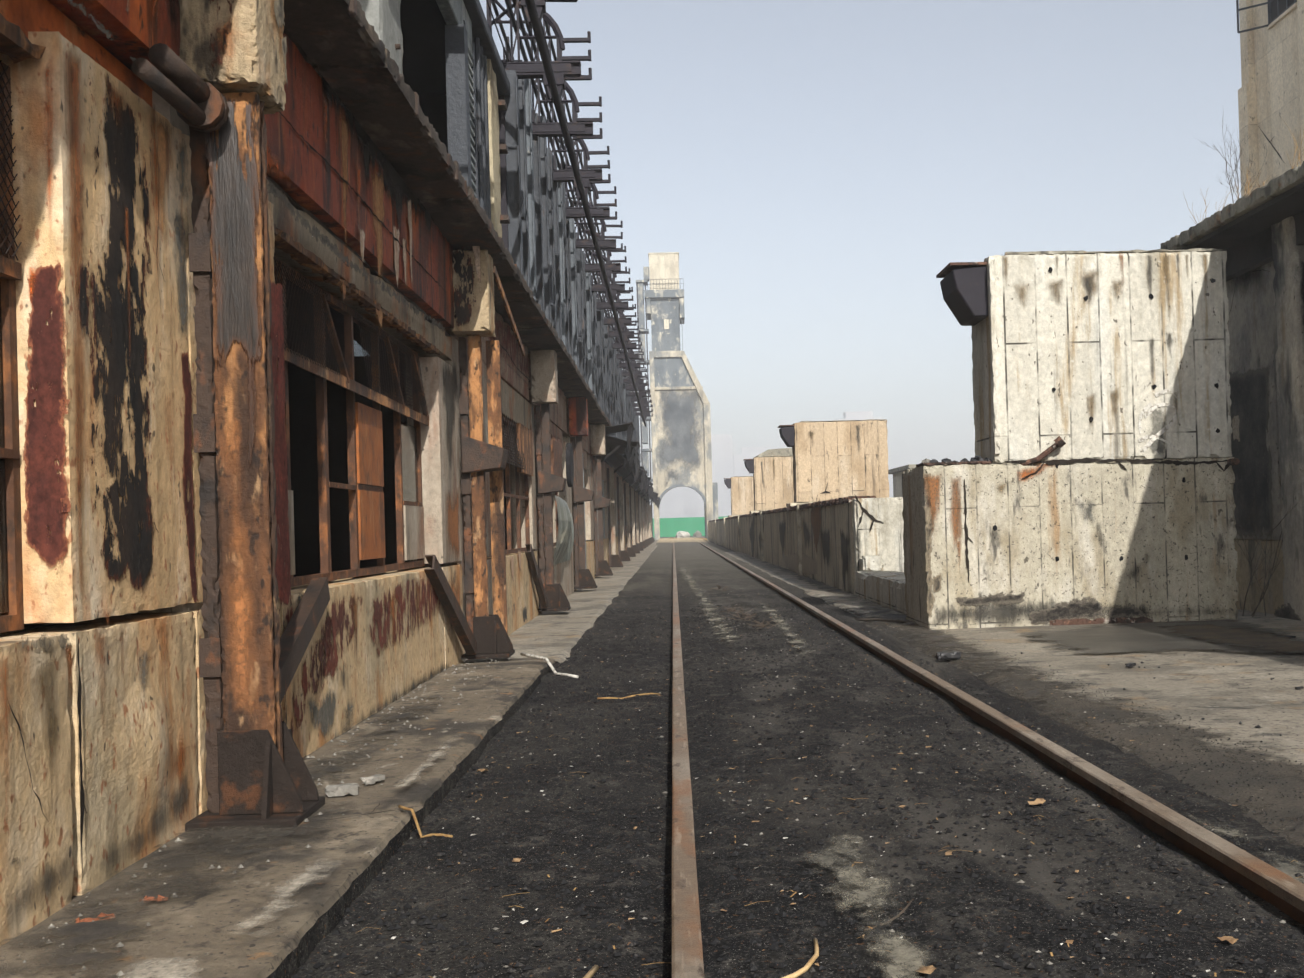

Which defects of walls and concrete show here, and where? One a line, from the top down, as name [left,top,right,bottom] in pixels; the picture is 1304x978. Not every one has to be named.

peeling [22,67,159,591]
rust [926,477,961,559]
rust [1019,465,1046,480]
rust [232,571,249,703]
peeling [280,578,440,738]
crack [8,701,49,822]